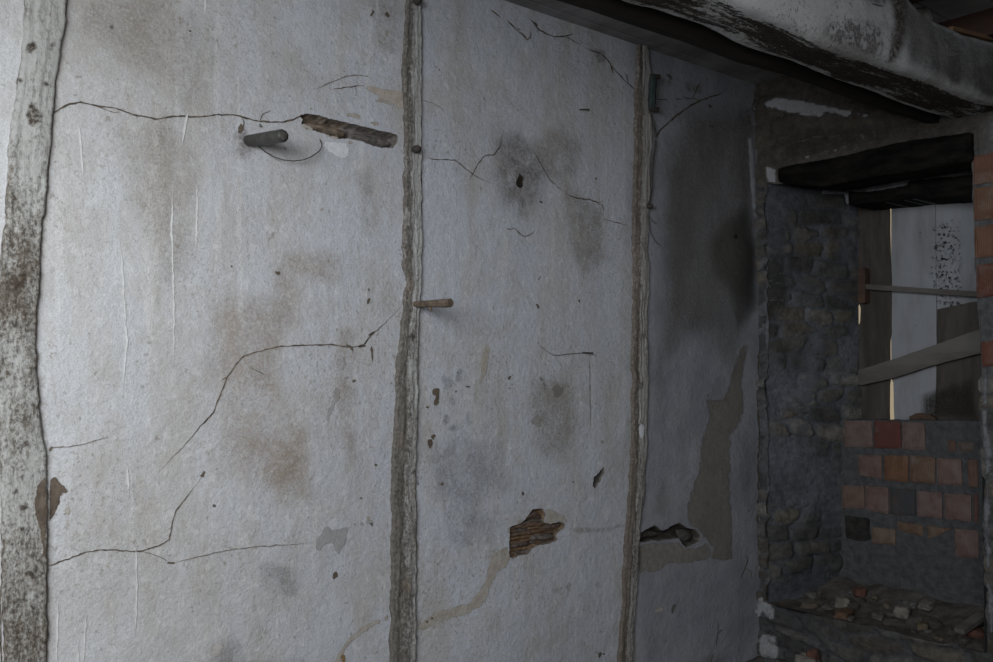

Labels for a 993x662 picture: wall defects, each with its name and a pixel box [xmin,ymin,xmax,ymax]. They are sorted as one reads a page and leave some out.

crack [46,76,300,202]
crack [534,152,626,225]
crack [162,313,395,468]
crack [48,477,304,566]
flaking render [419,508,567,630]
flaking render [639,523,711,573]